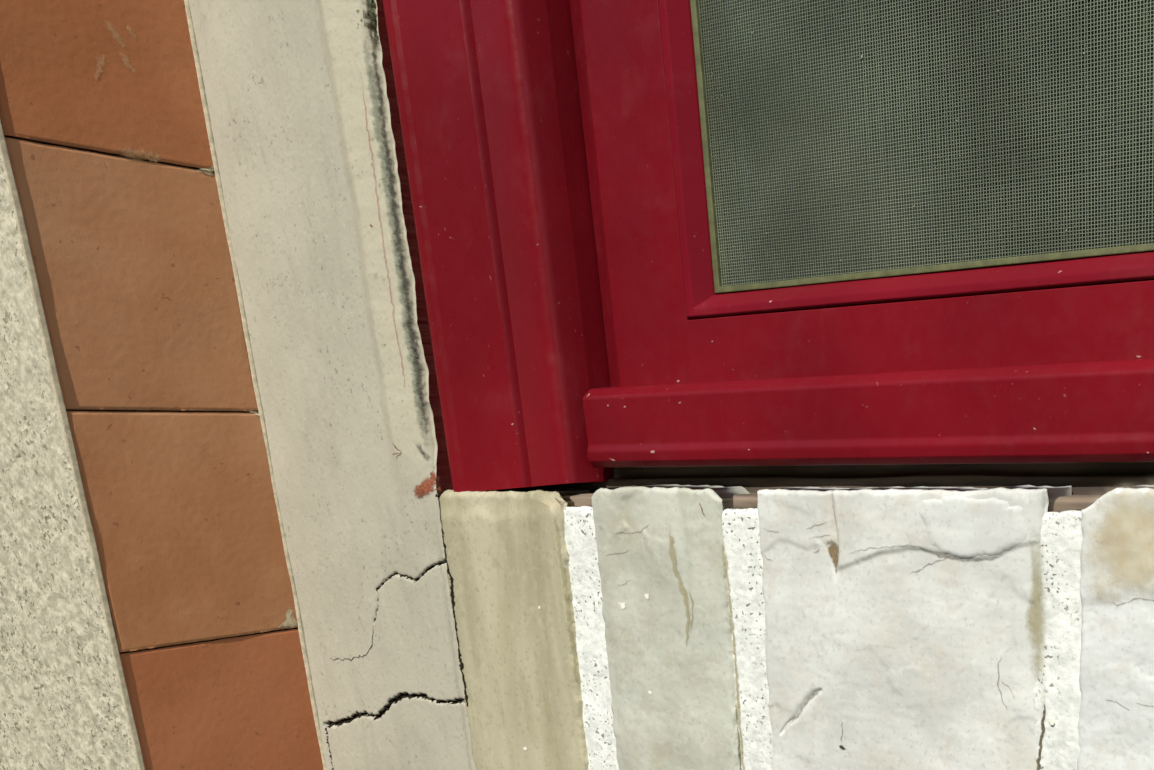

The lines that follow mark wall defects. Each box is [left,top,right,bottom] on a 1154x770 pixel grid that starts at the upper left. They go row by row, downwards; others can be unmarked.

damp [366,0,427,431]
crack [325,494,468,770]